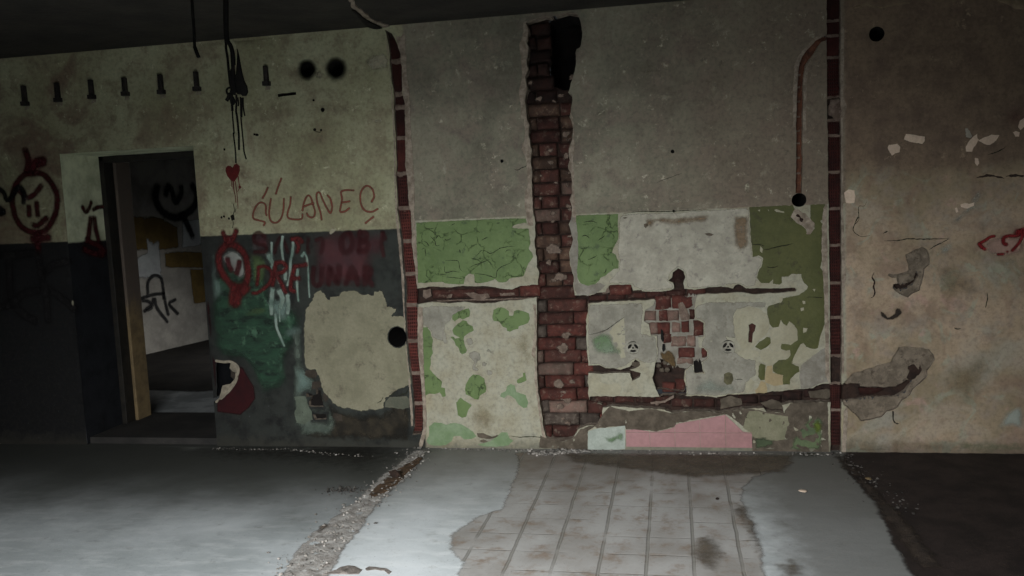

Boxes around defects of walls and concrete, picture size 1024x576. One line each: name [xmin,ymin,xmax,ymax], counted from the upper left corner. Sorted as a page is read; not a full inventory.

peeling [416,218,533,284]
peeling [492,307,530,332]
flaking render [576,193,828,397]
spalling [215,360,240,403]
flaking render [293,290,411,434]
peeling [423,308,513,447]
peeling [500,373,528,408]
spalling [842,346,935,424]
flaking render [539,402,829,452]